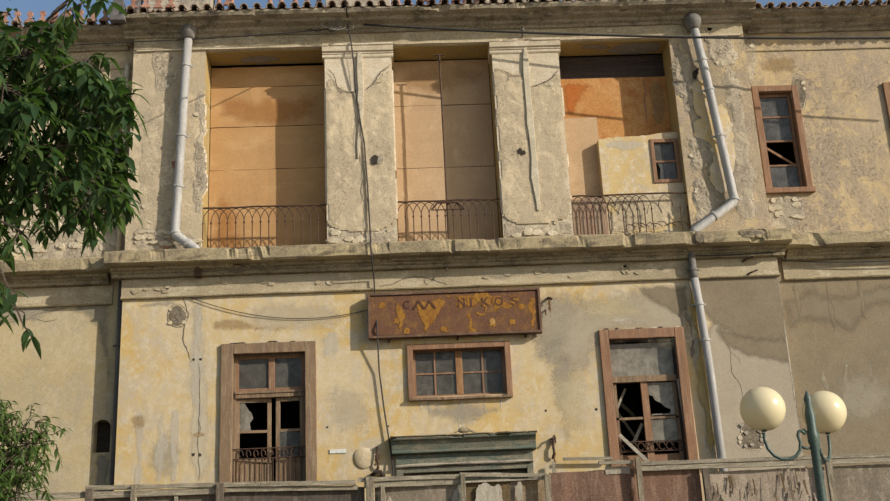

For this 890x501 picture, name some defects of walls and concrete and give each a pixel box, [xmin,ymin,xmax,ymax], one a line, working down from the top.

flaking render [6,38,233,259]
crack [329,65,390,228]
crack [495,68,558,87]
flaking render [492,68,572,238]
peeling [607,55,736,244]
flaking render [739,176,806,239]
leakage [539,277,804,471]
flaking render [737,422,767,451]